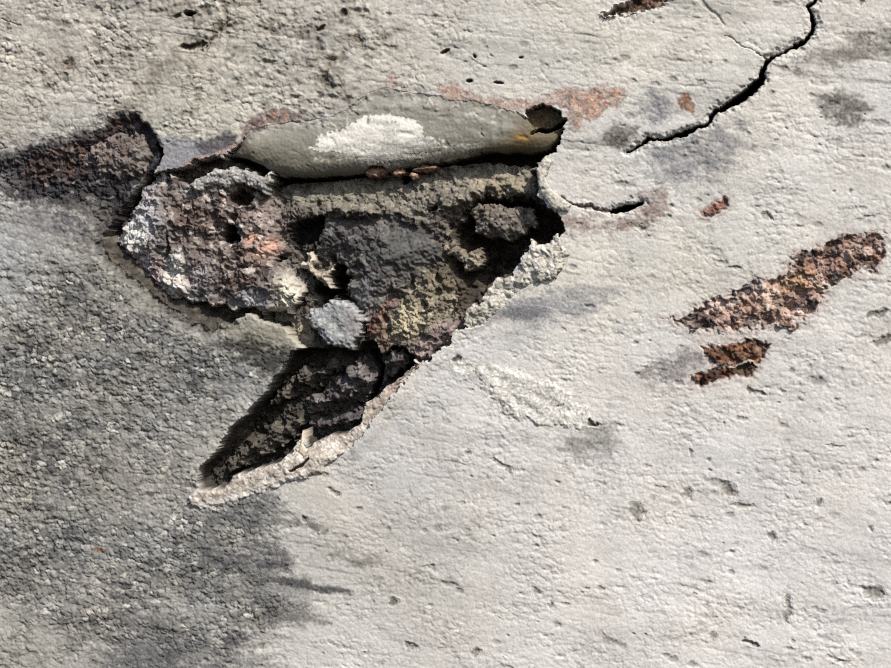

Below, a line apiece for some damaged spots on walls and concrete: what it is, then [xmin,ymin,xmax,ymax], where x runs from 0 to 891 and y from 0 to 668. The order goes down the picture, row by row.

efflorescence [309,113,481,171]
crack [557,193,644,215]
hole [599,0,670,19]
crack [627,0,818,154]
spalling [0,88,602,511]
corrosion [663,230,886,389]